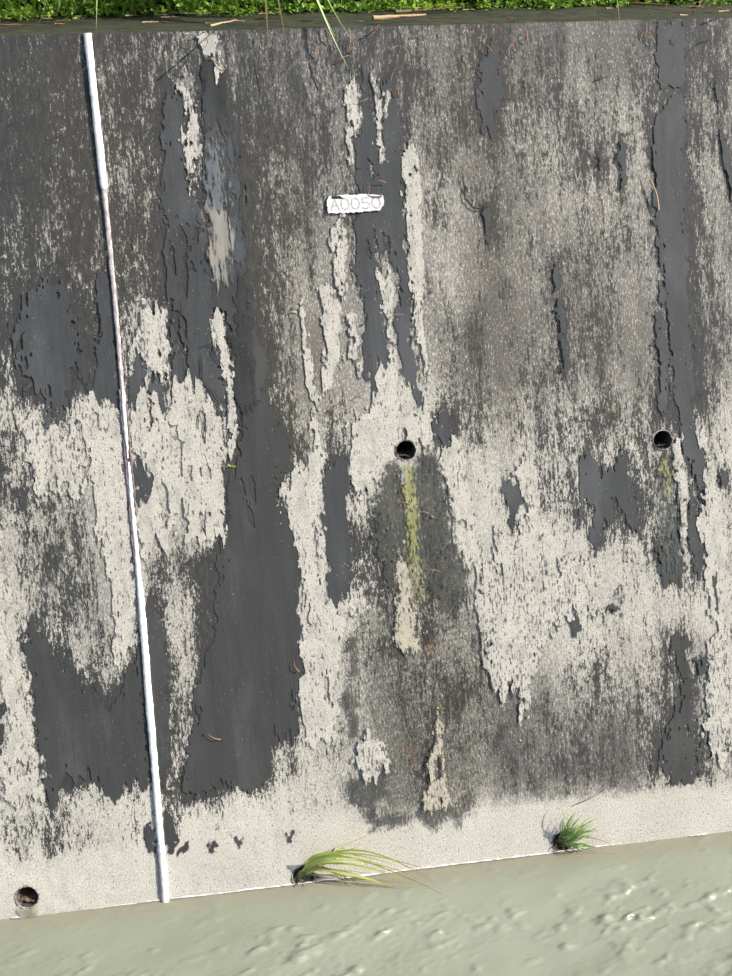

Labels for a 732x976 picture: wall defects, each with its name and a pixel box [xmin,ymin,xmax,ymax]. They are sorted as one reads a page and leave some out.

damp [339,443,500,834]
damp [643,447,703,589]